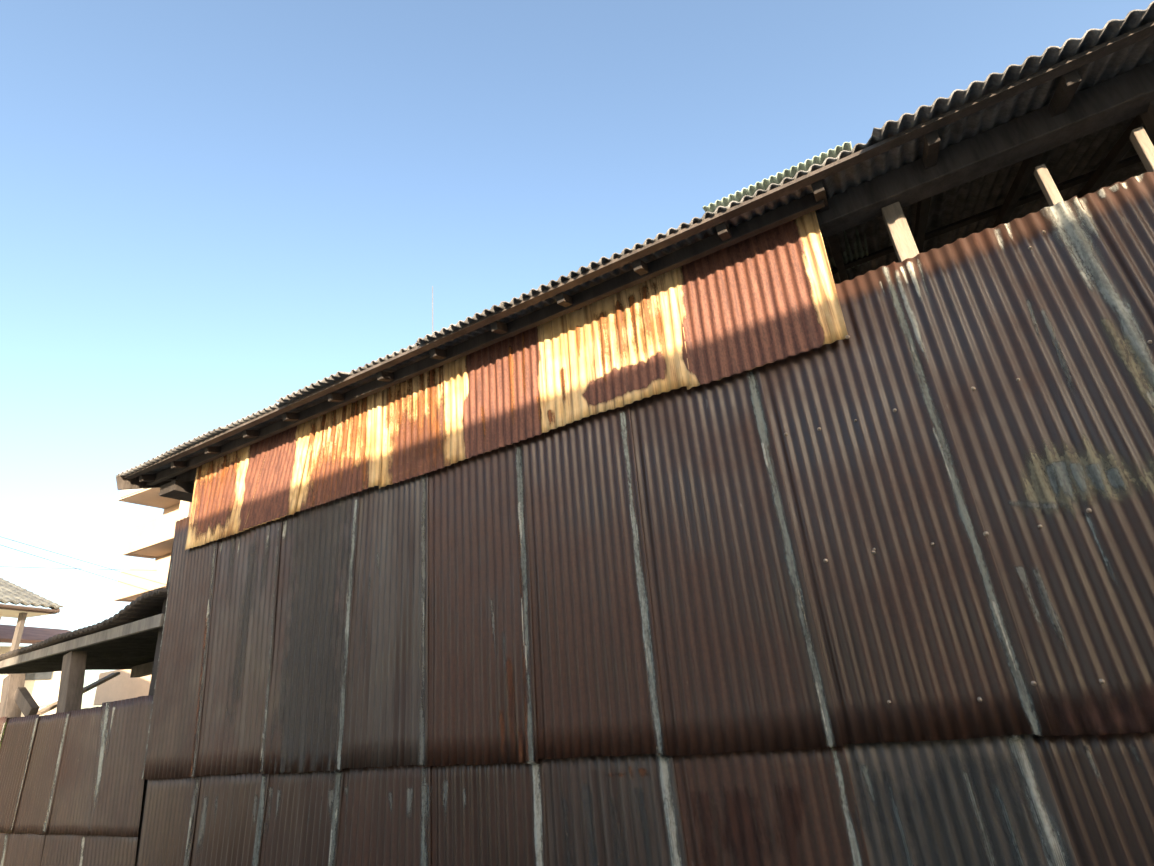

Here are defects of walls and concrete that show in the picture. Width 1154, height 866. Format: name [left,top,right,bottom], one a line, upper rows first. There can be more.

rust [190,397,370,540]
rust [387,366,450,483]
rust [461,326,555,458]
rust [582,283,667,406]
rust [680,219,825,384]
damp [1009,437,1154,577]
damp [855,744,1043,866]